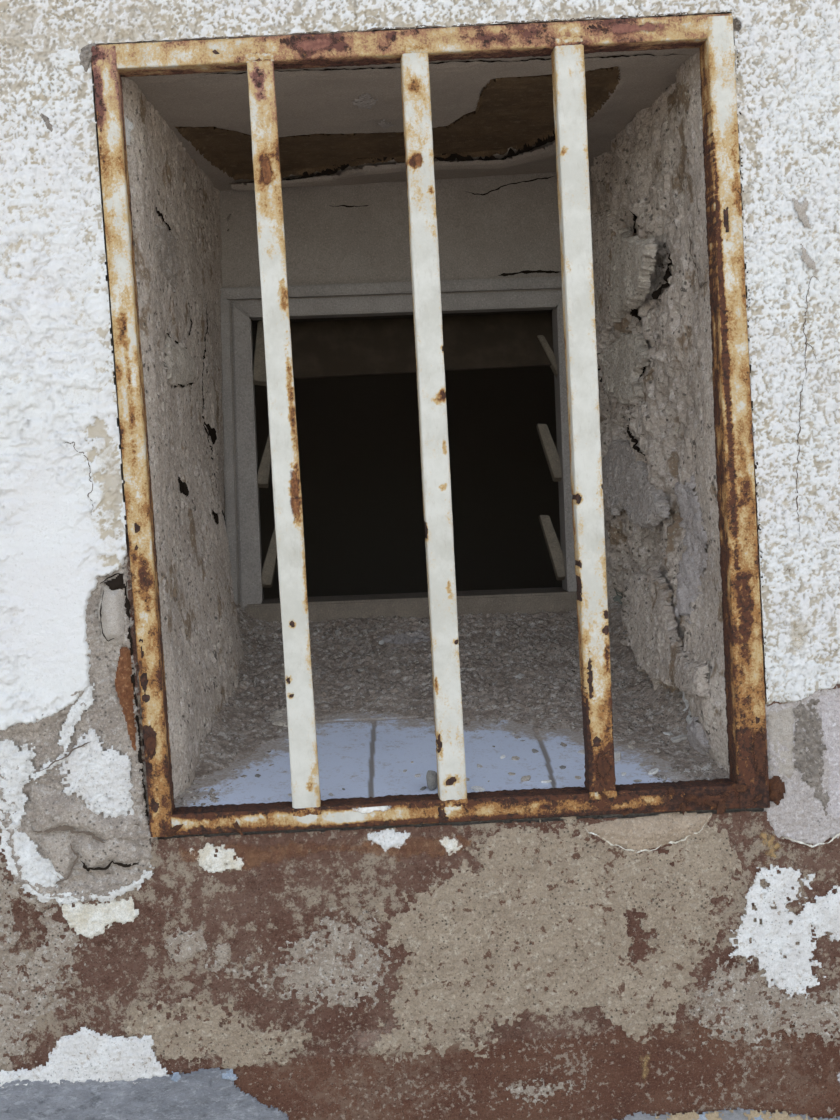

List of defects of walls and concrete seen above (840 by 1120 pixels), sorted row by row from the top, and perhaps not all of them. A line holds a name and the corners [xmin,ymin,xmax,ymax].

rust [612,22,664,34]
rust [260,156,272,184]
rust [290,470,300,518]
rust [115,647,157,755]
rust [753,729,785,805]
rust [182,835,471,870]
peeling [0,555,840,1120]